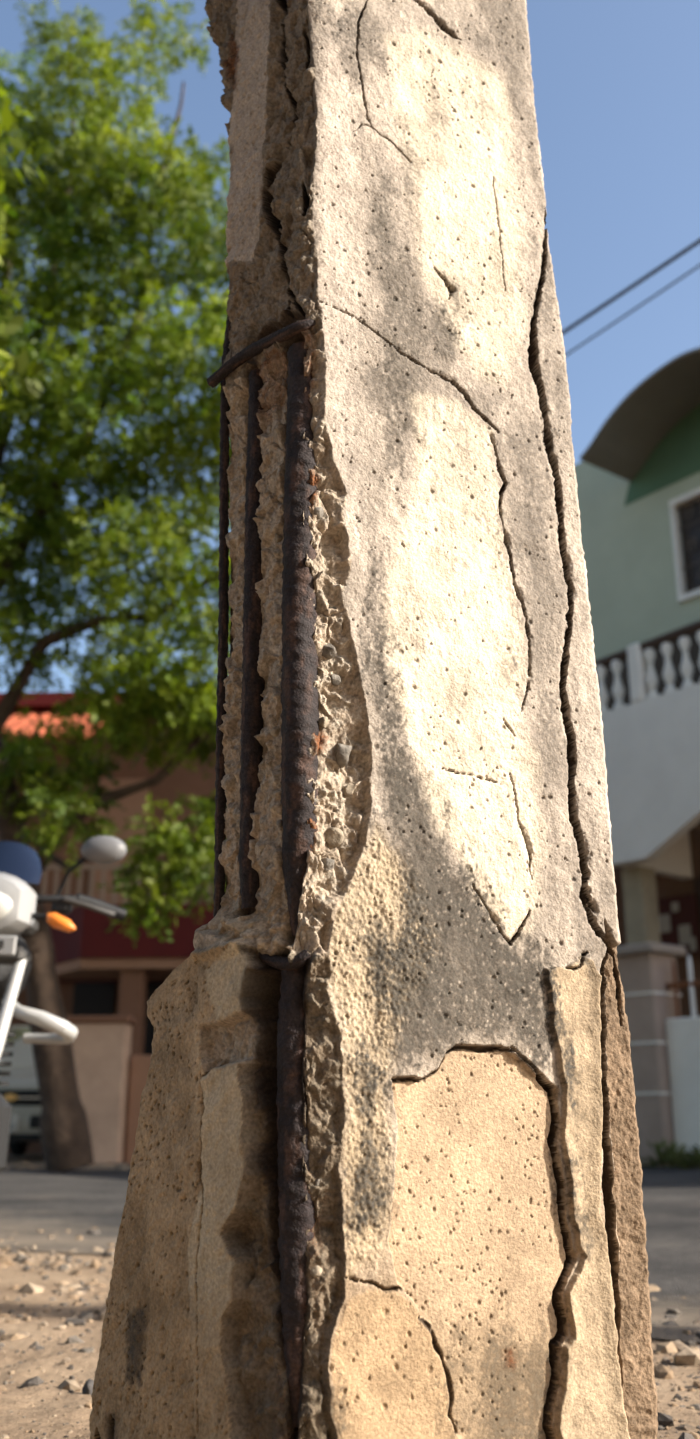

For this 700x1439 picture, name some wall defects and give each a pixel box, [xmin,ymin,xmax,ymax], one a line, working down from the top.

corrosion [309,472,319,505]
leakage [509,423,558,599]
corrosion [313,732,328,751]
peeling [199,0,658,1439]
crack [262,0,623,1383]
leakage [343,558,576,1236]
leakage [550,1148,592,1255]